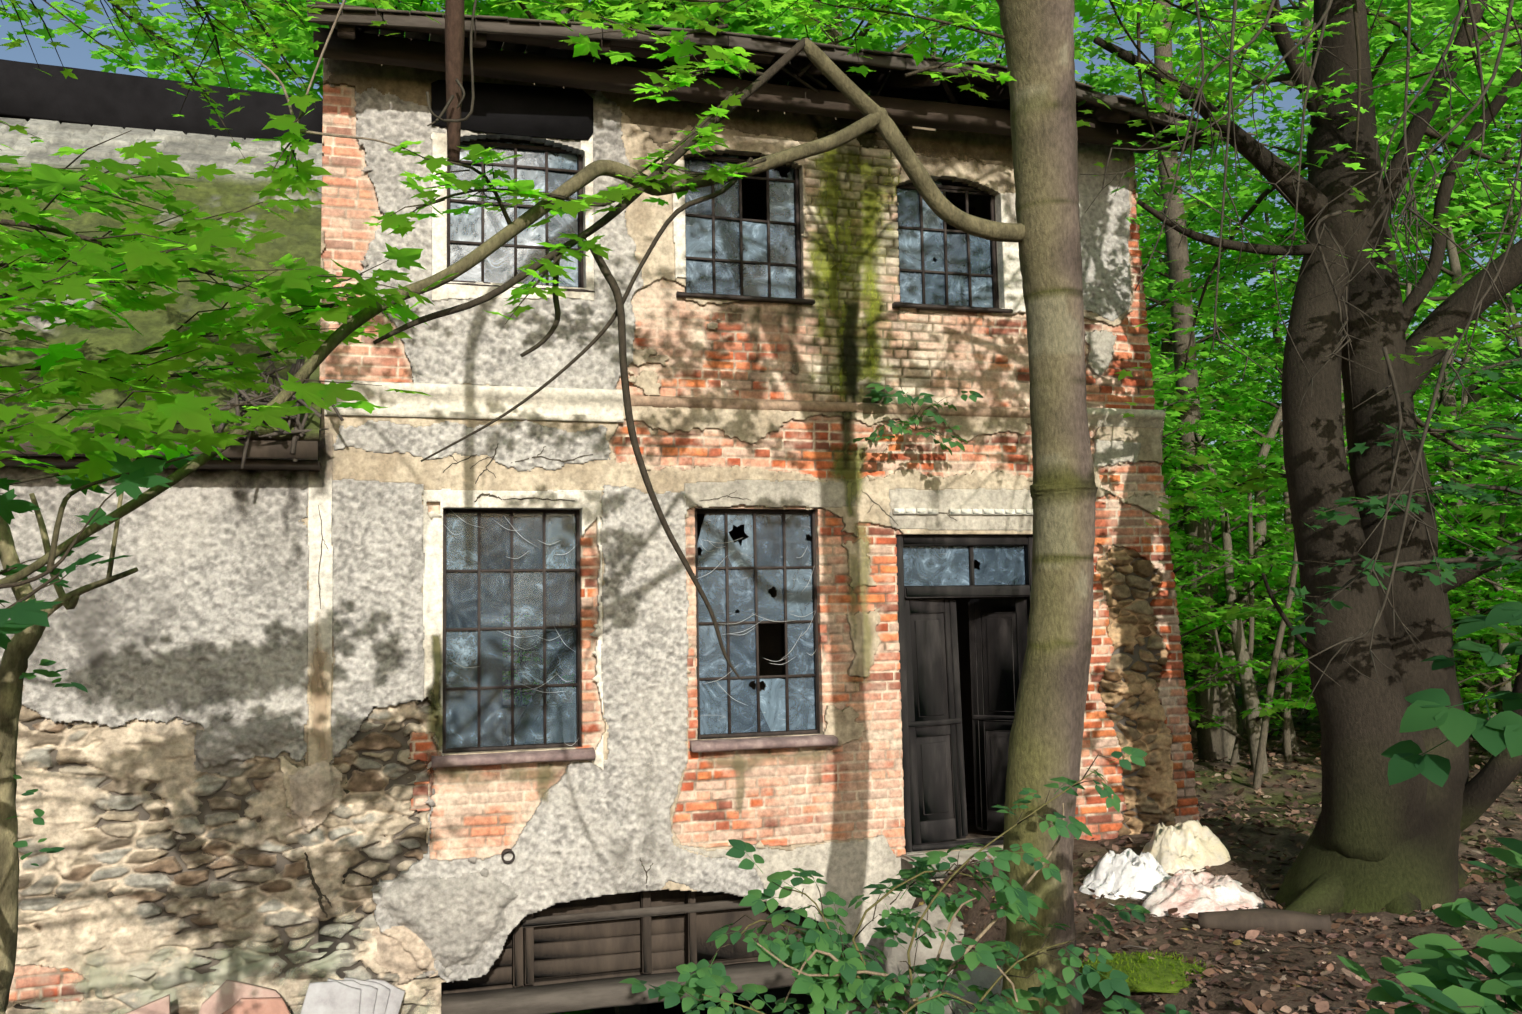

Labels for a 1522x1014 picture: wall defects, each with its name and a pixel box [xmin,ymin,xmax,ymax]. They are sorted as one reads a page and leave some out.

flaking render [319,83,413,397]
damp [718,307,760,362]
flaking render [609,129,1033,482]
damp [777,118,893,666]
flaking render [1084,183,1159,421]
flaking render [6,518,605,1014]
flaking render [671,505,906,857]
flaking render [1074,429,1200,841]